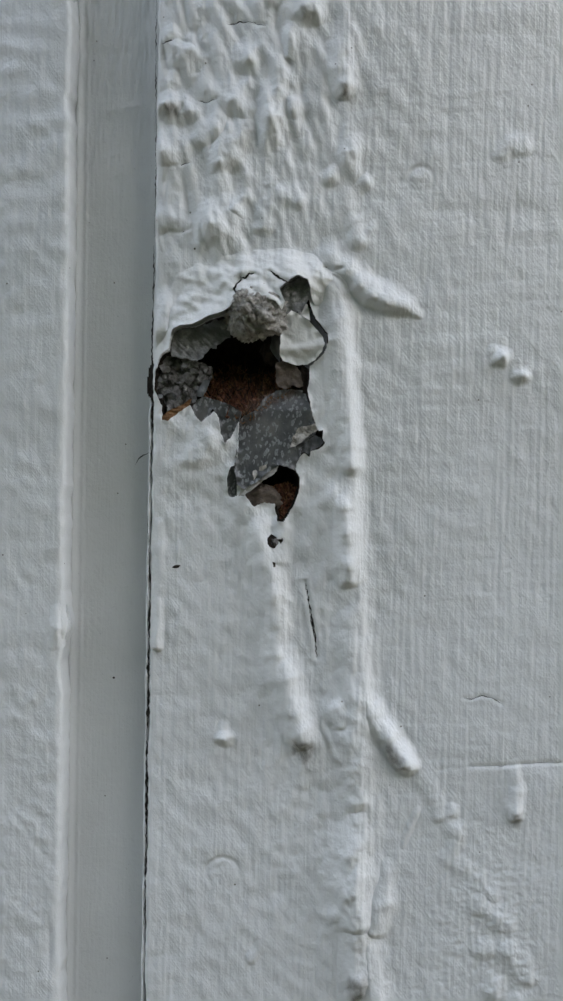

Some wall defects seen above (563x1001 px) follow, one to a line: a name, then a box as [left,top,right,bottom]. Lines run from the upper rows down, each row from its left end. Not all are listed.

peeling [147,248,333,522]
peeling [267,534,283,548]